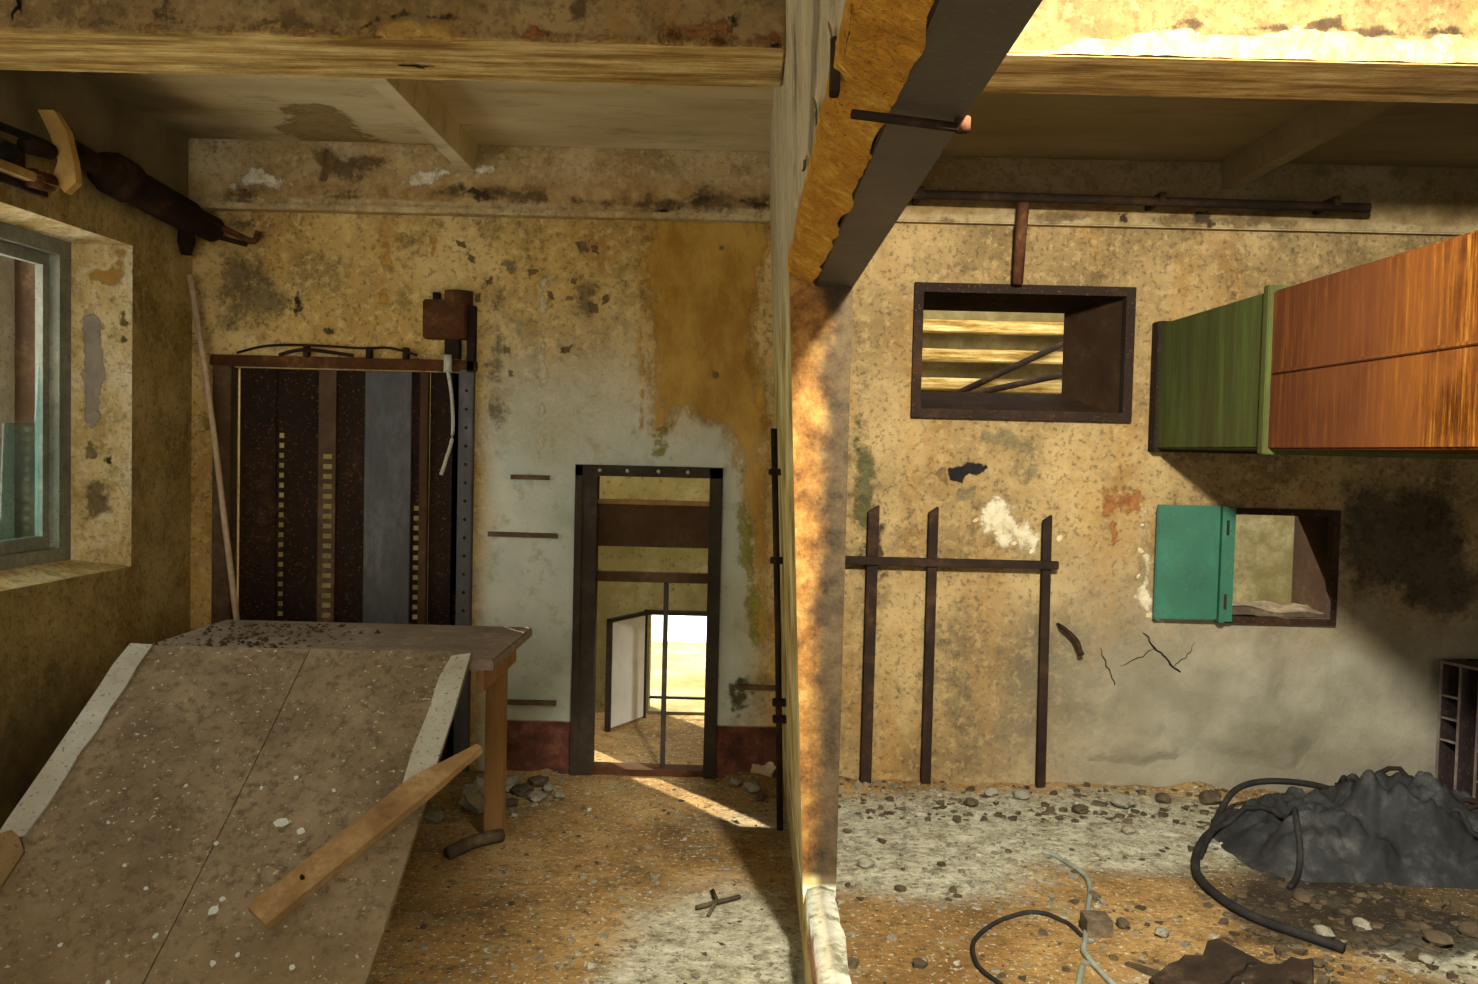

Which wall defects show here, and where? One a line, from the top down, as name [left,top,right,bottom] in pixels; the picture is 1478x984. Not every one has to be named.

damp [275,104,389,199]
damp [433,182,548,204]
flaking render [576,241,599,255]
flaking render [546,278,610,313]
spalling [935,462,988,483]
peeling [973,496,1063,554]
crack [1101,633,1193,685]